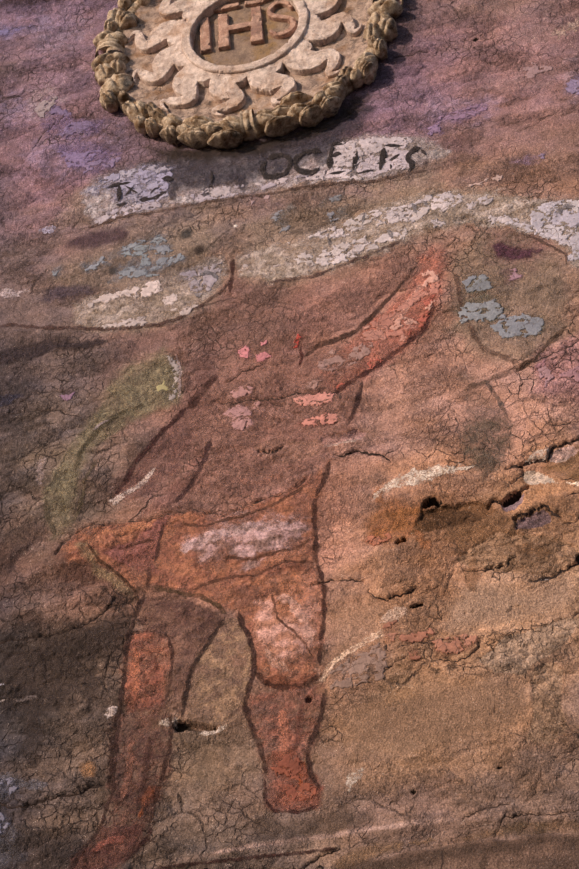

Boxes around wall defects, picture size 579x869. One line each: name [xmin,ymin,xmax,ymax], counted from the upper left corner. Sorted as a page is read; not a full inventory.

crack [519,329,579,371]
crack [335,450,396,462]
flaking render [550,445,579,463]
flaking render [408,471,579,576]
peeling [328,619,478,690]
flaking render [479,616,579,744]
crack [462,720,579,836]